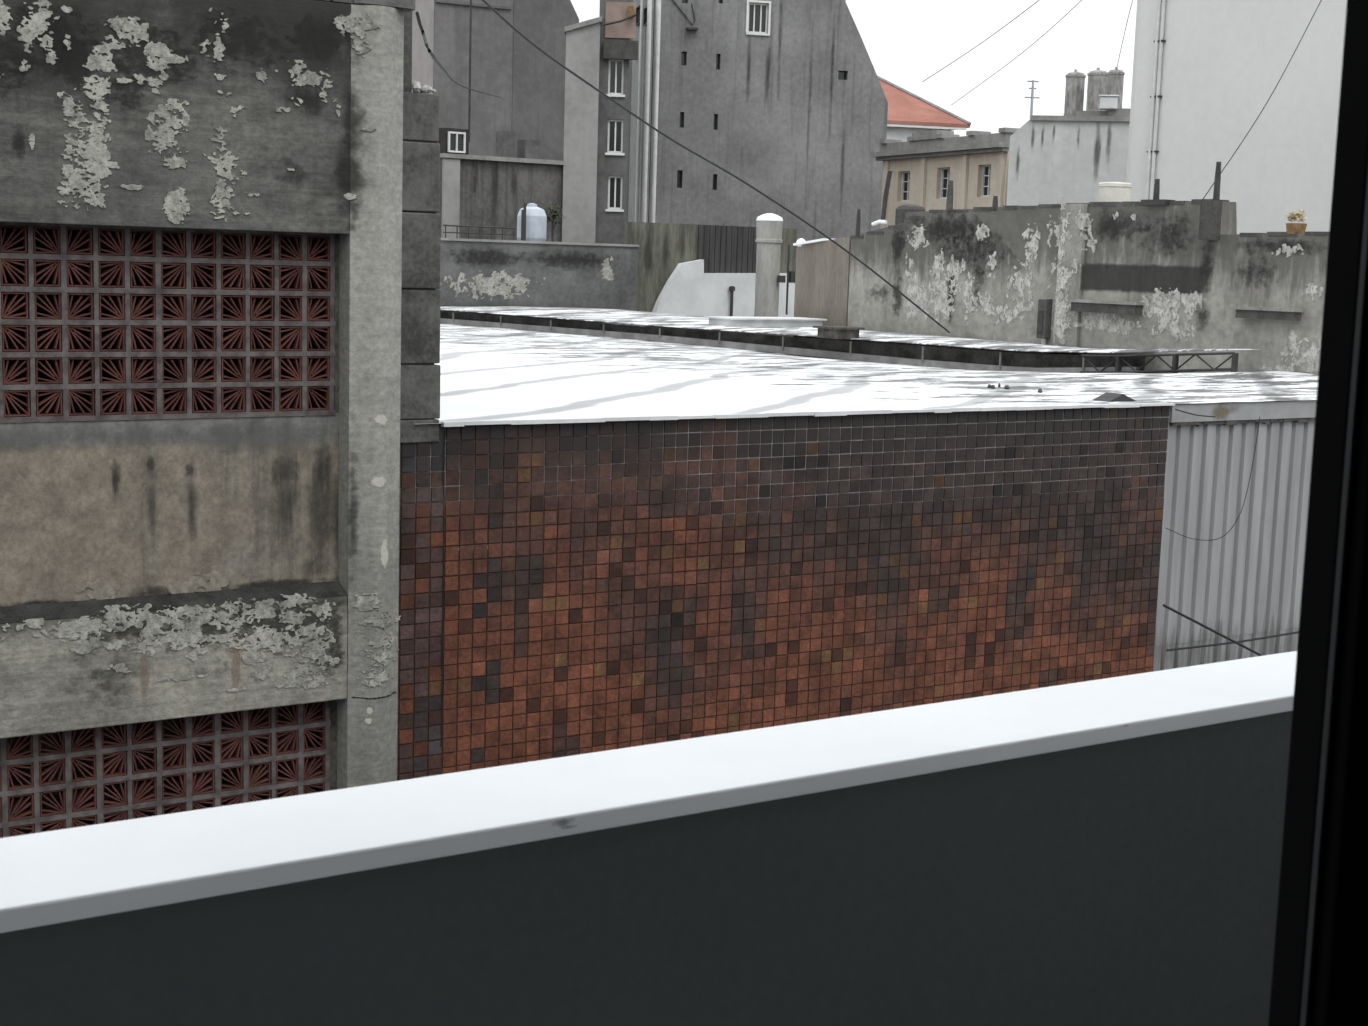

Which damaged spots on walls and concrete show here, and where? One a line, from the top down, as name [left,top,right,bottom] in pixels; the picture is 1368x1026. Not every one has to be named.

peeling [0,0,72,78]
peeling [57,8,260,224]
peeling [256,60,341,117]
water stain [294,94,321,114]
water stain [336,95,362,210]
peeling [440,270,545,300]
peeling [900,197,1205,346]
water stain [1081,246,1212,294]
peeling [1271,244,1304,257]
peeling [1259,330,1321,373]
water stain [311,458,357,553]
peeling [0,571,401,692]